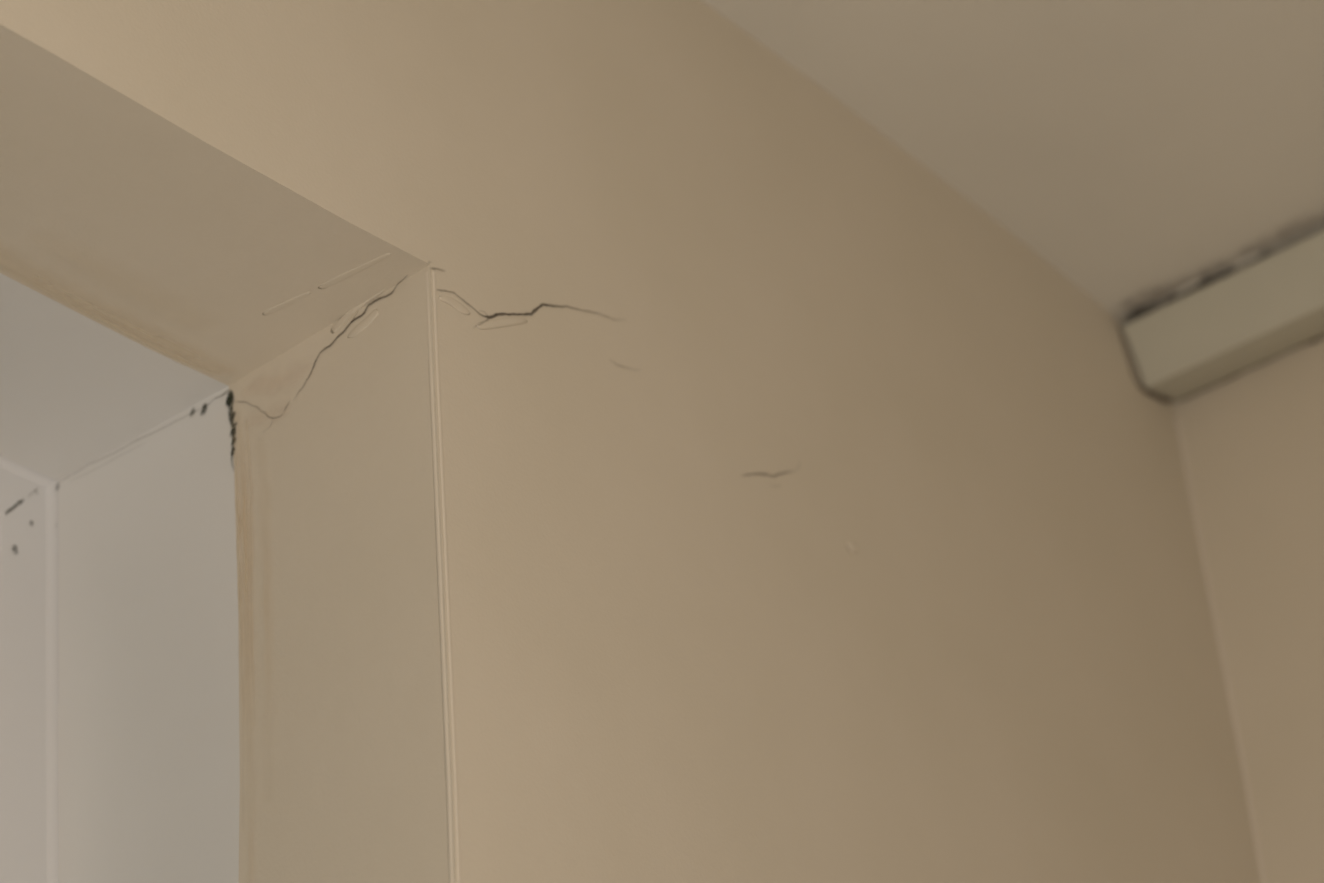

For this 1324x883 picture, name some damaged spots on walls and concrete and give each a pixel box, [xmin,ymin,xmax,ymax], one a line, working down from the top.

crack [439,295,554,330]